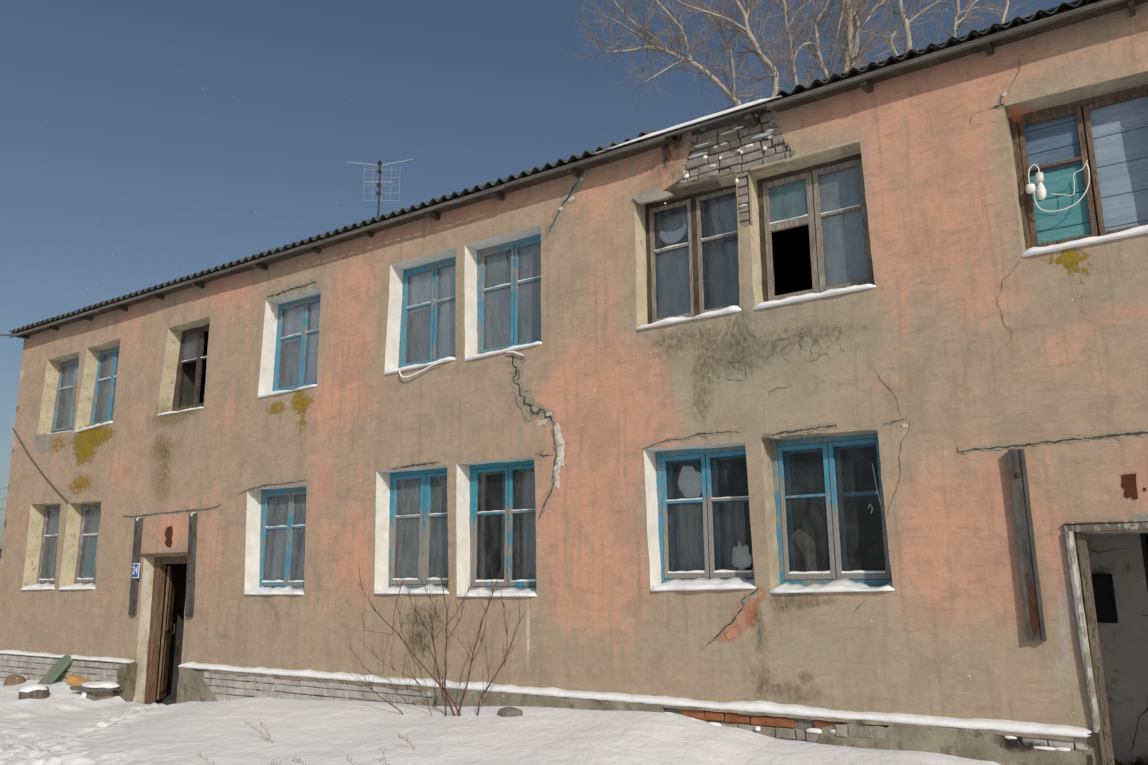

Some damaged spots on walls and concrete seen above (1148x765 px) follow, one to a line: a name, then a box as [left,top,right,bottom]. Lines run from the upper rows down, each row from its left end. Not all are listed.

flaking render [633,108,861,227]
crack [545,169,591,237]
crack [698,323,845,404]
crack [504,353,565,520]
crack [641,422,837,450]
crack [957,428,1148,454]
rust [1121,474,1146,500]
peeling [719,589,764,641]